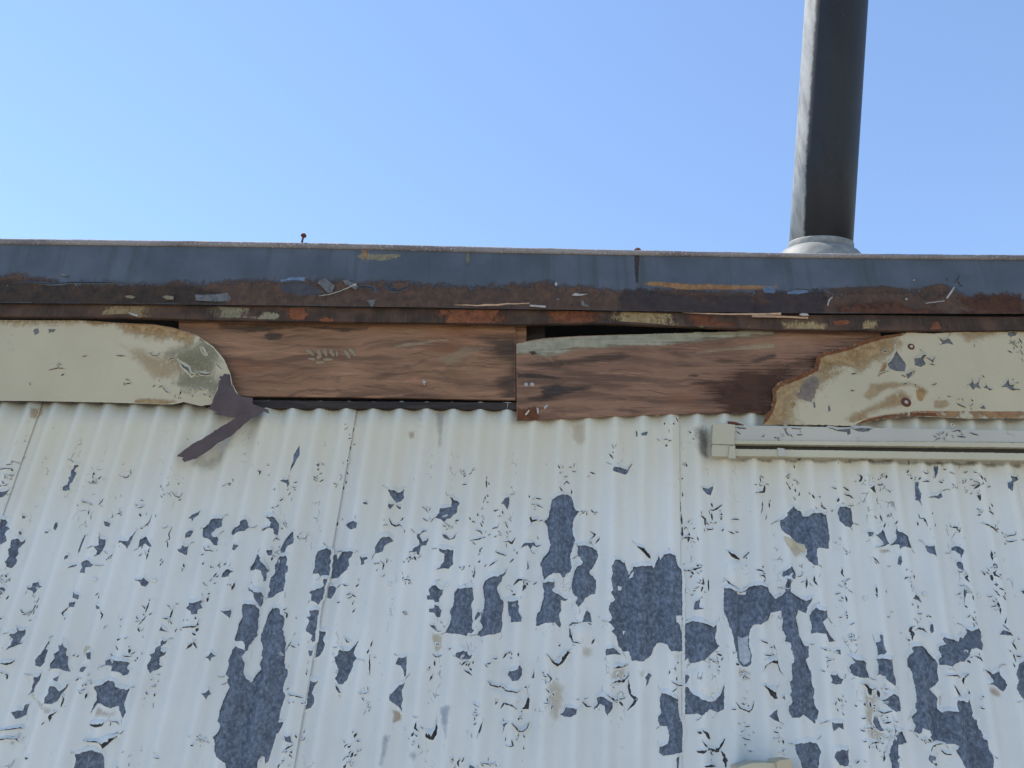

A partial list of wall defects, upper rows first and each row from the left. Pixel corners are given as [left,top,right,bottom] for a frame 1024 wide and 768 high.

rust [0,255,1024,330]
rust [87,321,204,345]
peeling [883,333,955,380]
peeling [382,484,408,511]
peeling [913,464,951,507]
peeling [0,512,28,571]
peeling [62,518,154,575]
peeling [175,509,297,768]
peeling [303,532,396,712]
peeling [406,491,1024,768]
peeling [0,623,174,768]
peeling [386,653,411,716]